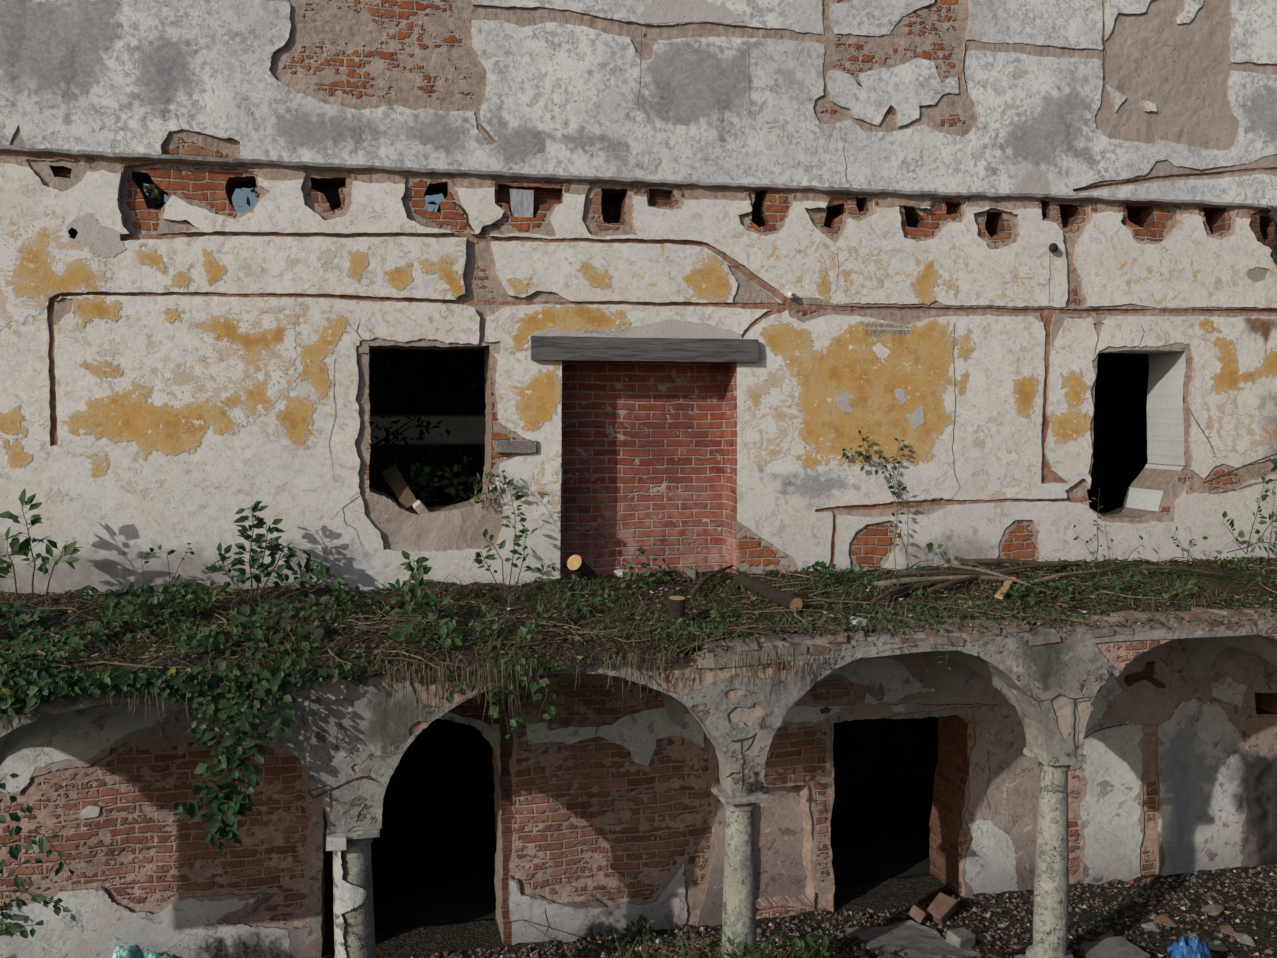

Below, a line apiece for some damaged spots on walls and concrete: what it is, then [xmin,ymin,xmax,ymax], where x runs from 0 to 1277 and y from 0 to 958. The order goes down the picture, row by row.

damp [642,41,756,141]
flaking render [267,0,1277,151]
peeling [0,125,1277,573]
flaking render [0,734,330,929]
flaking render [408,648,833,945]
flaking render [1050,629,1180,885]